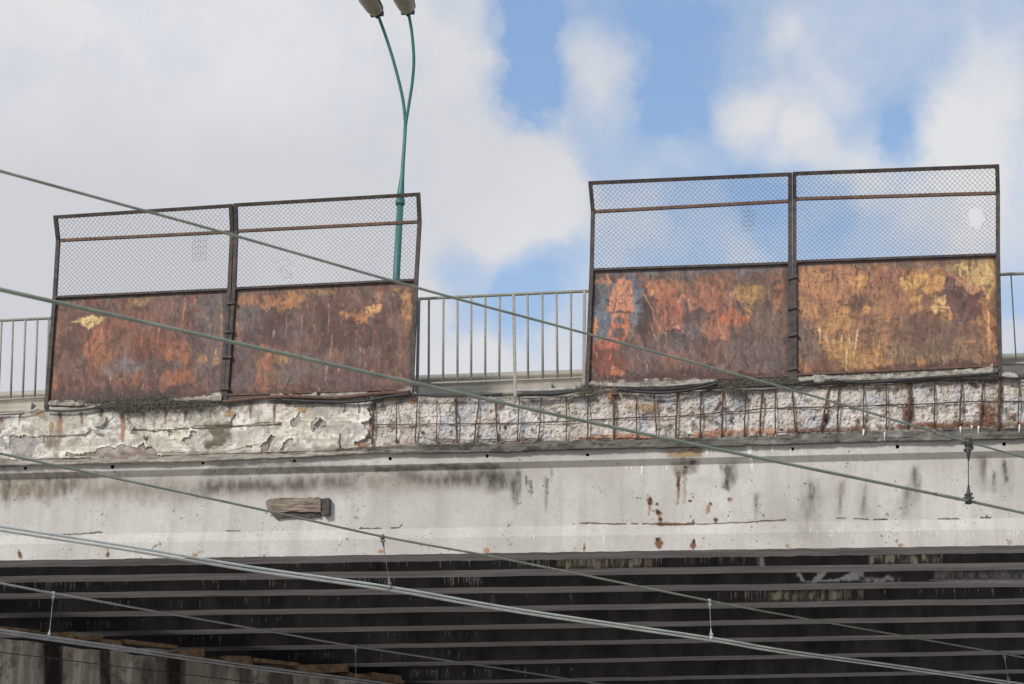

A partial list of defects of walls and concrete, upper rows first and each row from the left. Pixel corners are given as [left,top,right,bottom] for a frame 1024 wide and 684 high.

spalling [343,372,1024,448]
spalling [0,435,38,460]
spalling [66,443,160,459]
spalling [168,431,199,446]
spalling [260,403,327,453]
corrosion [668,388,1023,504]
water stain [2,479,76,500]
water stain [192,459,351,493]
water stain [375,464,504,489]
water stain [724,465,734,490]
corrosion [647,497,694,548]
water stain [731,554,1024,601]